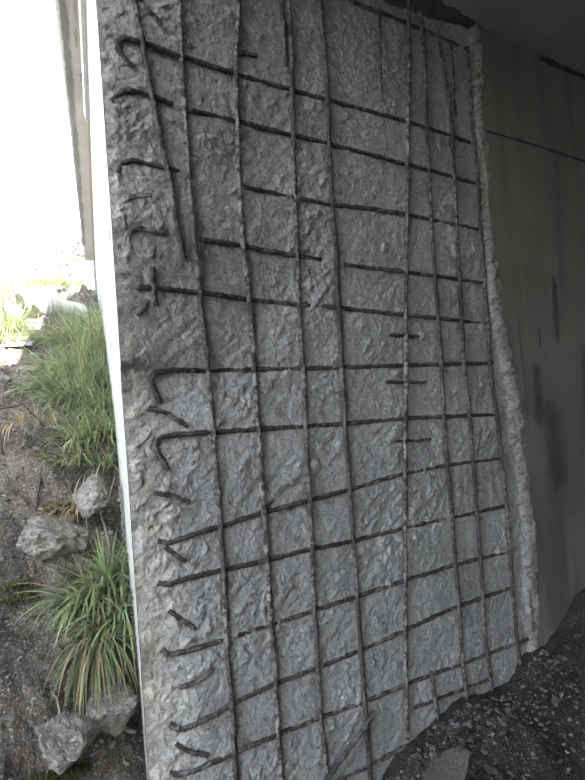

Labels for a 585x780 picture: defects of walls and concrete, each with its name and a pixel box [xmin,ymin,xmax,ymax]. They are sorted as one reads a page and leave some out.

spalling [97,0,541,780]